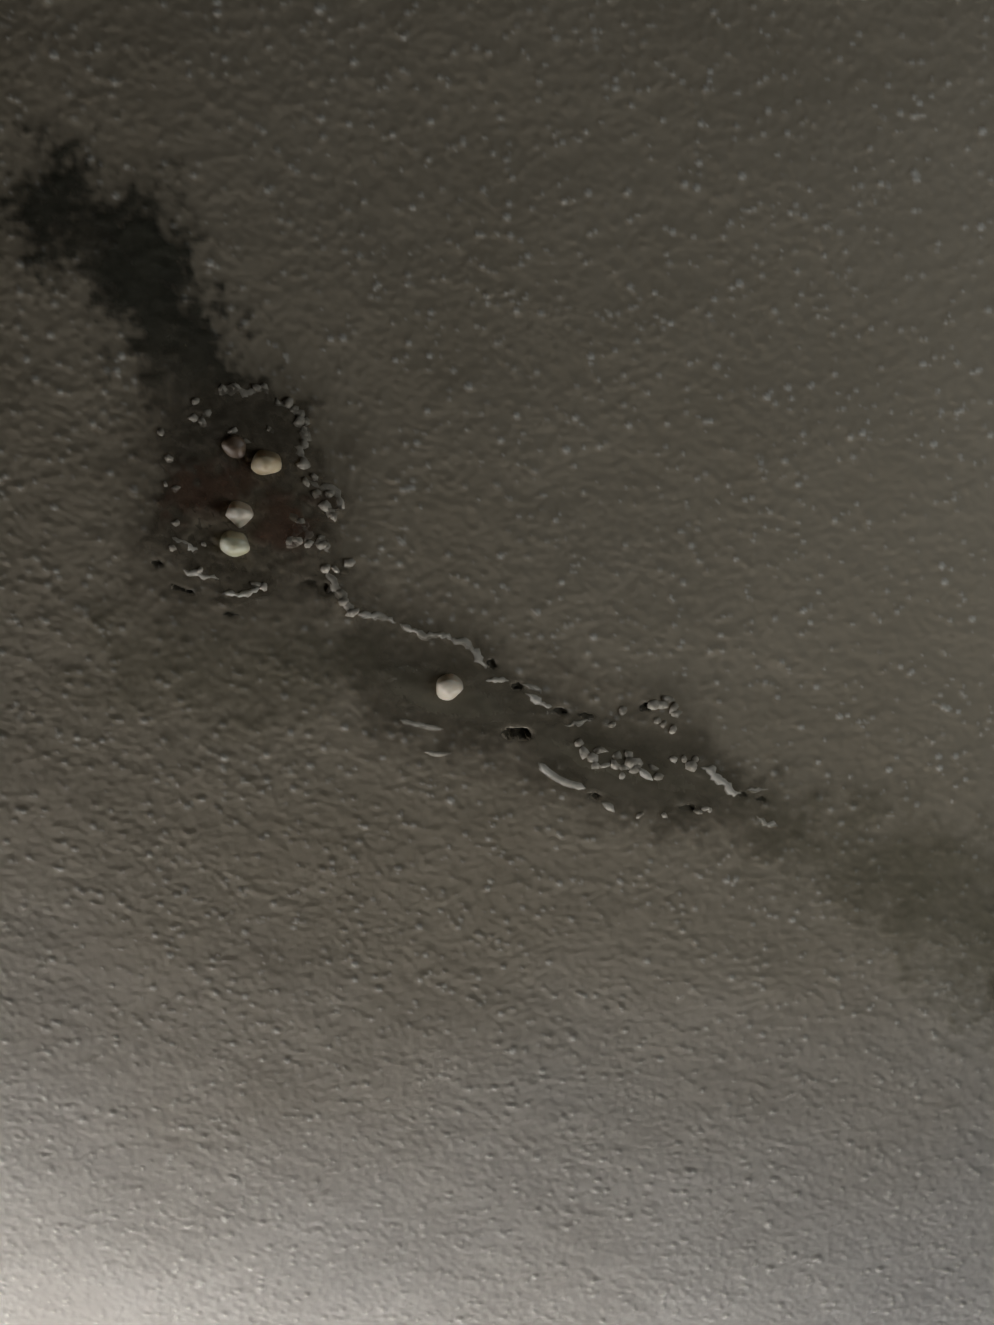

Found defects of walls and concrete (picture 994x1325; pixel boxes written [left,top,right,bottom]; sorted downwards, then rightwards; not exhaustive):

damp [1,142,292,485]
flaking render [144,381,359,617]
peeling [608,695,682,734]
peeling [574,738,699,781]
peeling [661,805,712,818]